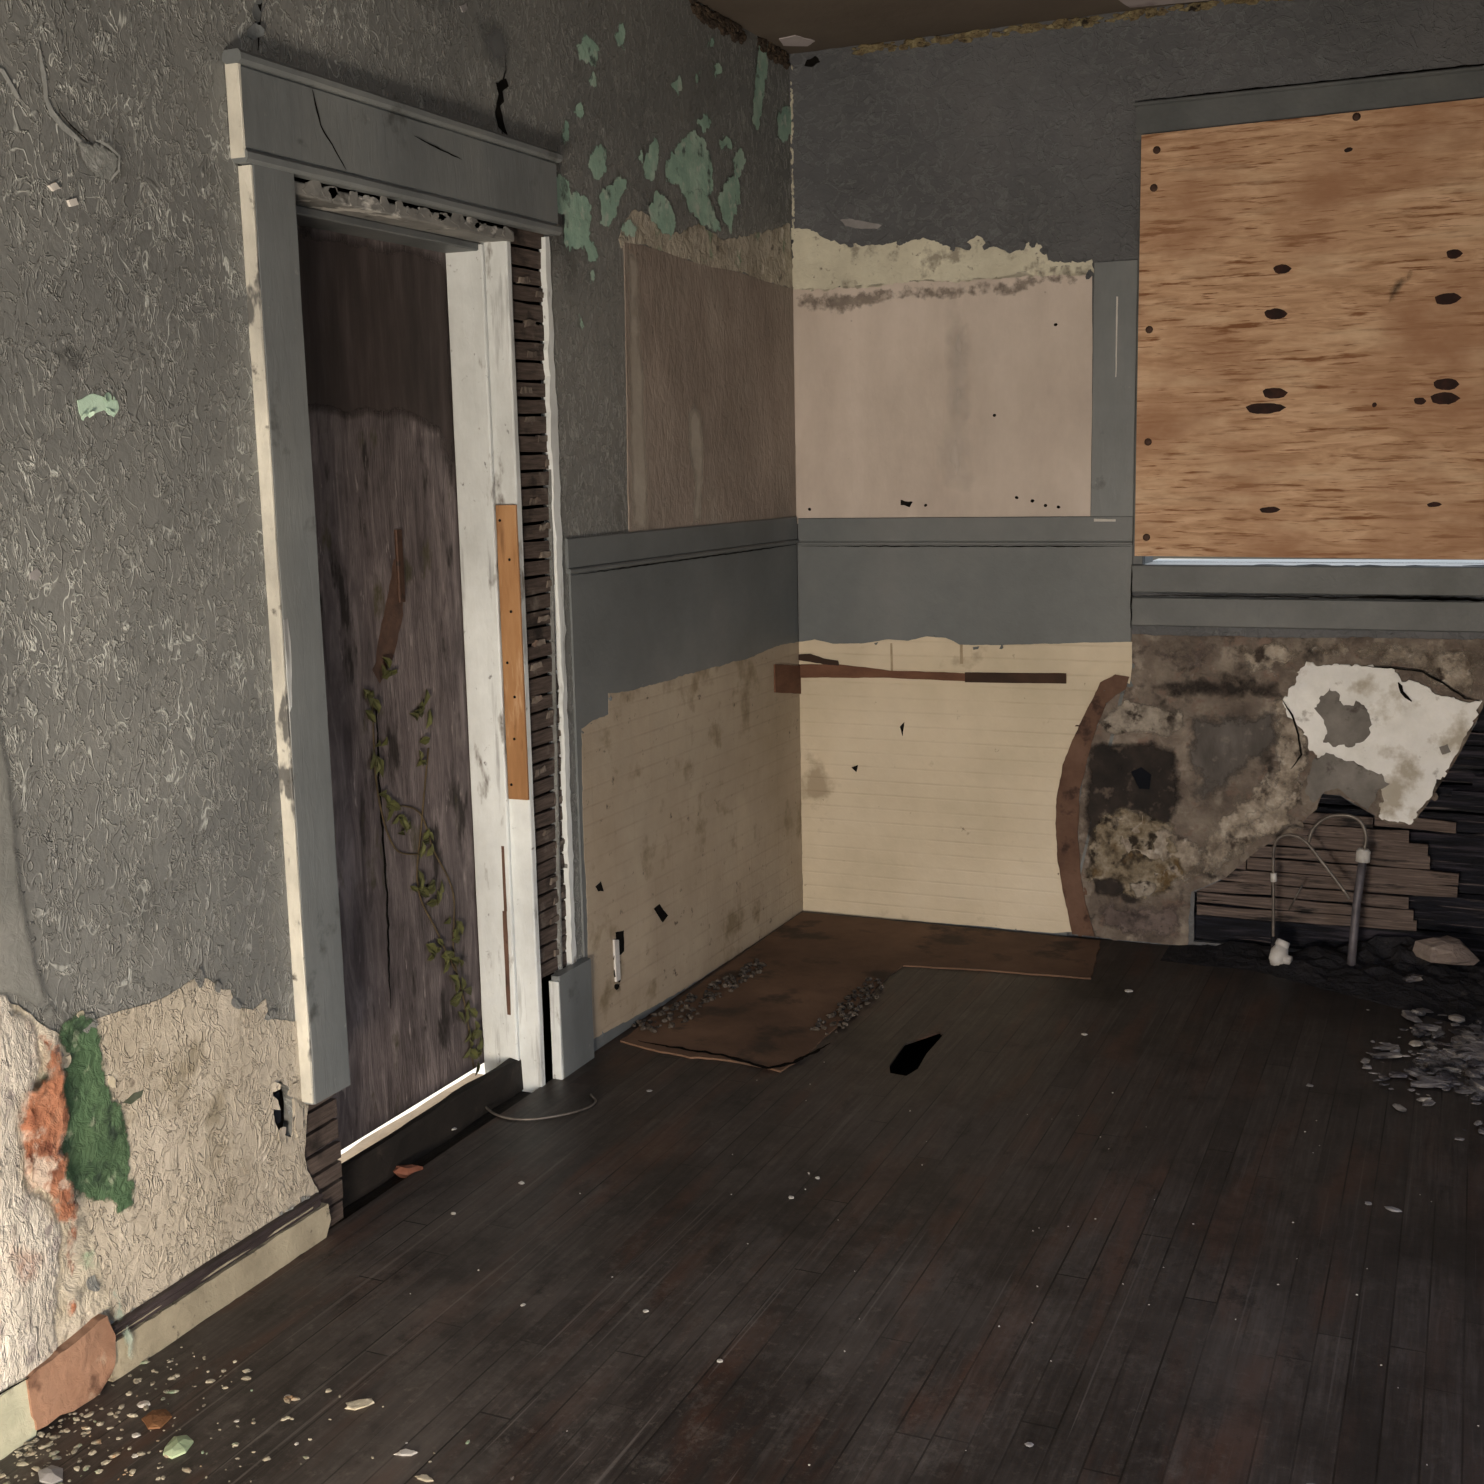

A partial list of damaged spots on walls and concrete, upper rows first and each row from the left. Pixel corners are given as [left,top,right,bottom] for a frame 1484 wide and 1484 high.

crack [495,56,508,135]
flaking render [556,0,1094,532]
spalling [852,0,1292,56]
peeling [581,634,1484,1039]
peeling [0,968,319,1395]